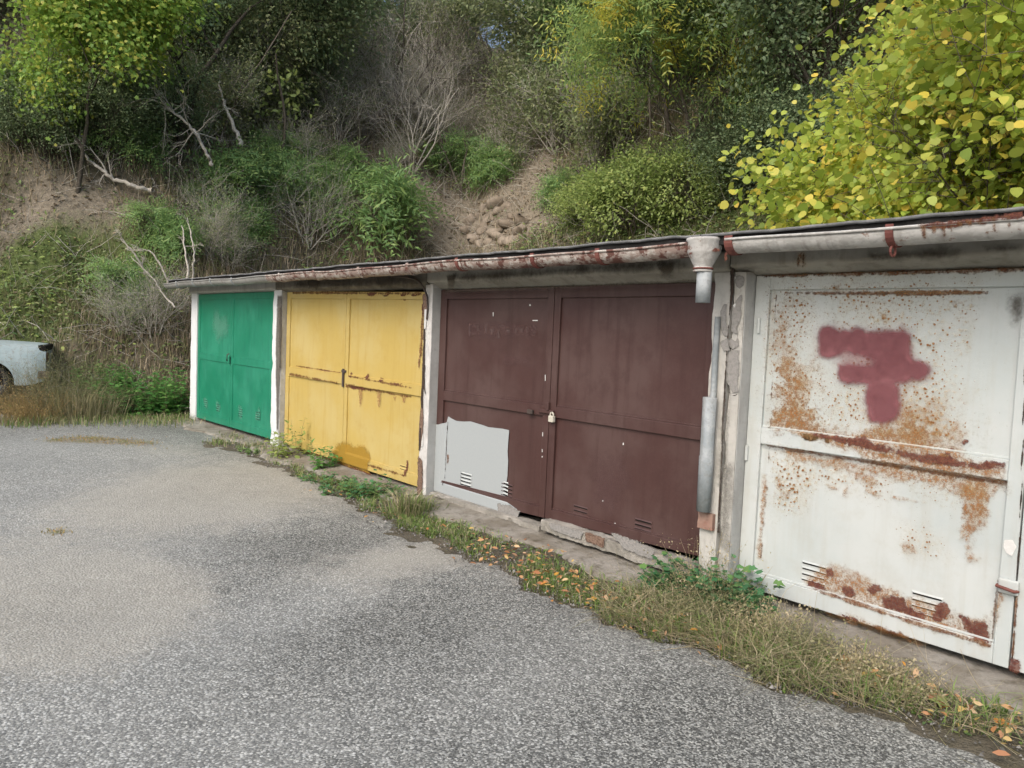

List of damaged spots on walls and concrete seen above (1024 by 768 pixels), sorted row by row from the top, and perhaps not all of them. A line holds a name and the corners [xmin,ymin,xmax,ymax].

rust [920,212,1023,239]
rust [289,365,411,406]
rust [757,254,1023,559]
rust [296,448,408,476]
spalling [549,523,654,560]
rust [808,567,1003,647]
rust [1009,658,1021,675]